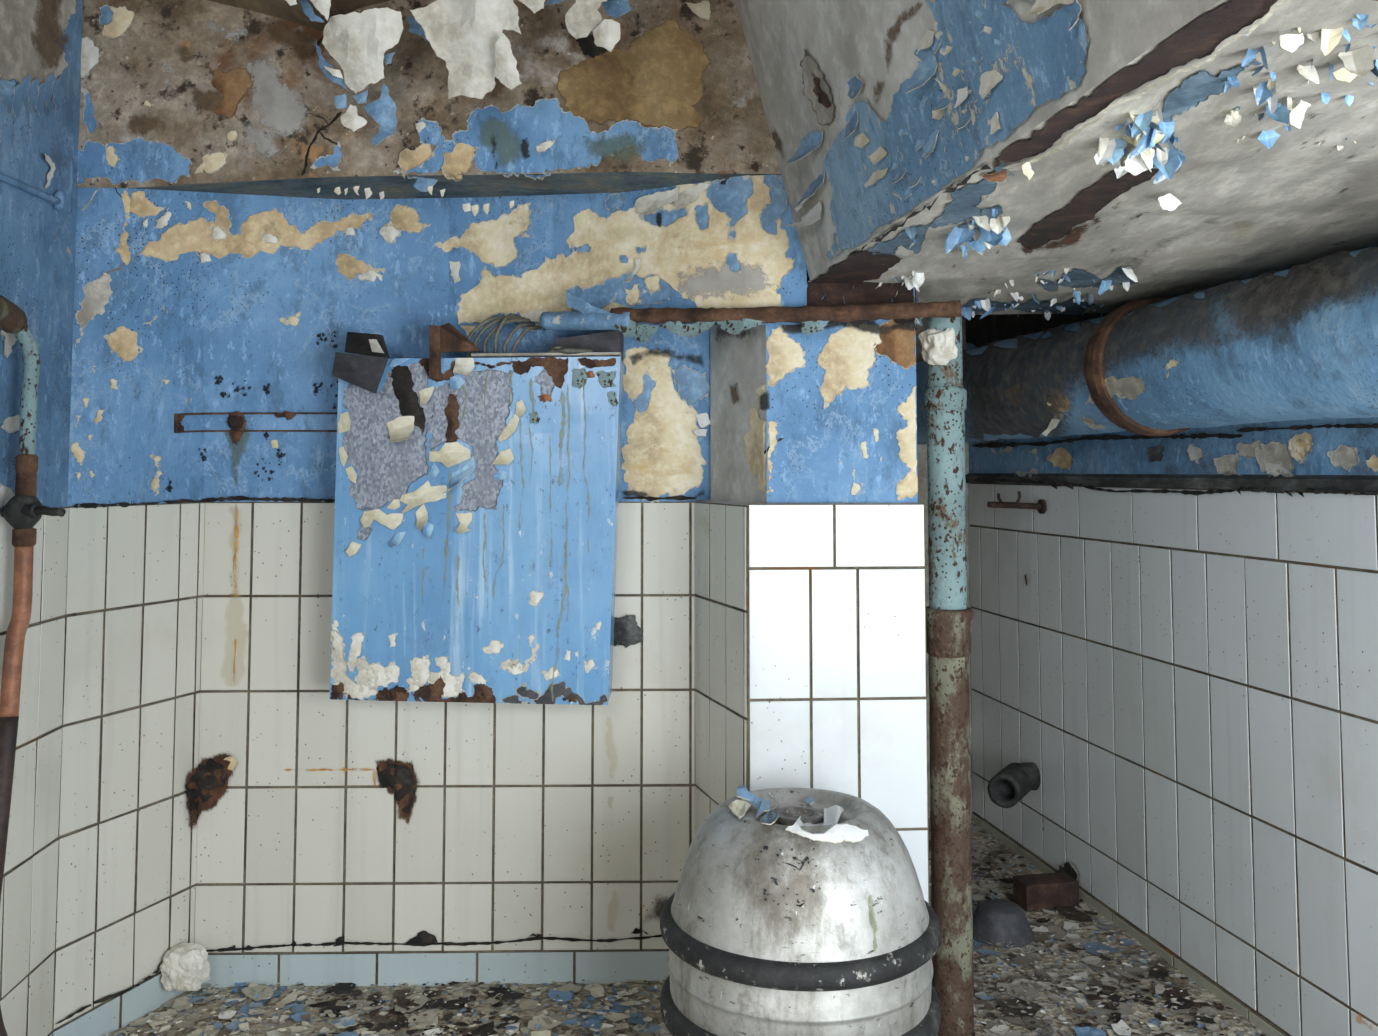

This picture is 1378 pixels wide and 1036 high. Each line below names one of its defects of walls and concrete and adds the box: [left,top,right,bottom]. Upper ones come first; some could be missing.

flaking render [0,0,76,119]
peeling [44,153,56,189]
flaking render [77,0,711,282]
flaking render [434,0,1378,503]
flaking render [75,273,113,347]
flaking render [104,316,158,362]
flaking render [0,484,15,508]
peeling [70,398,107,481]
peeling [150,454,163,496]
peeling [338,339,526,557]
peeling [330,620,608,705]
spalling [595,615,644,649]